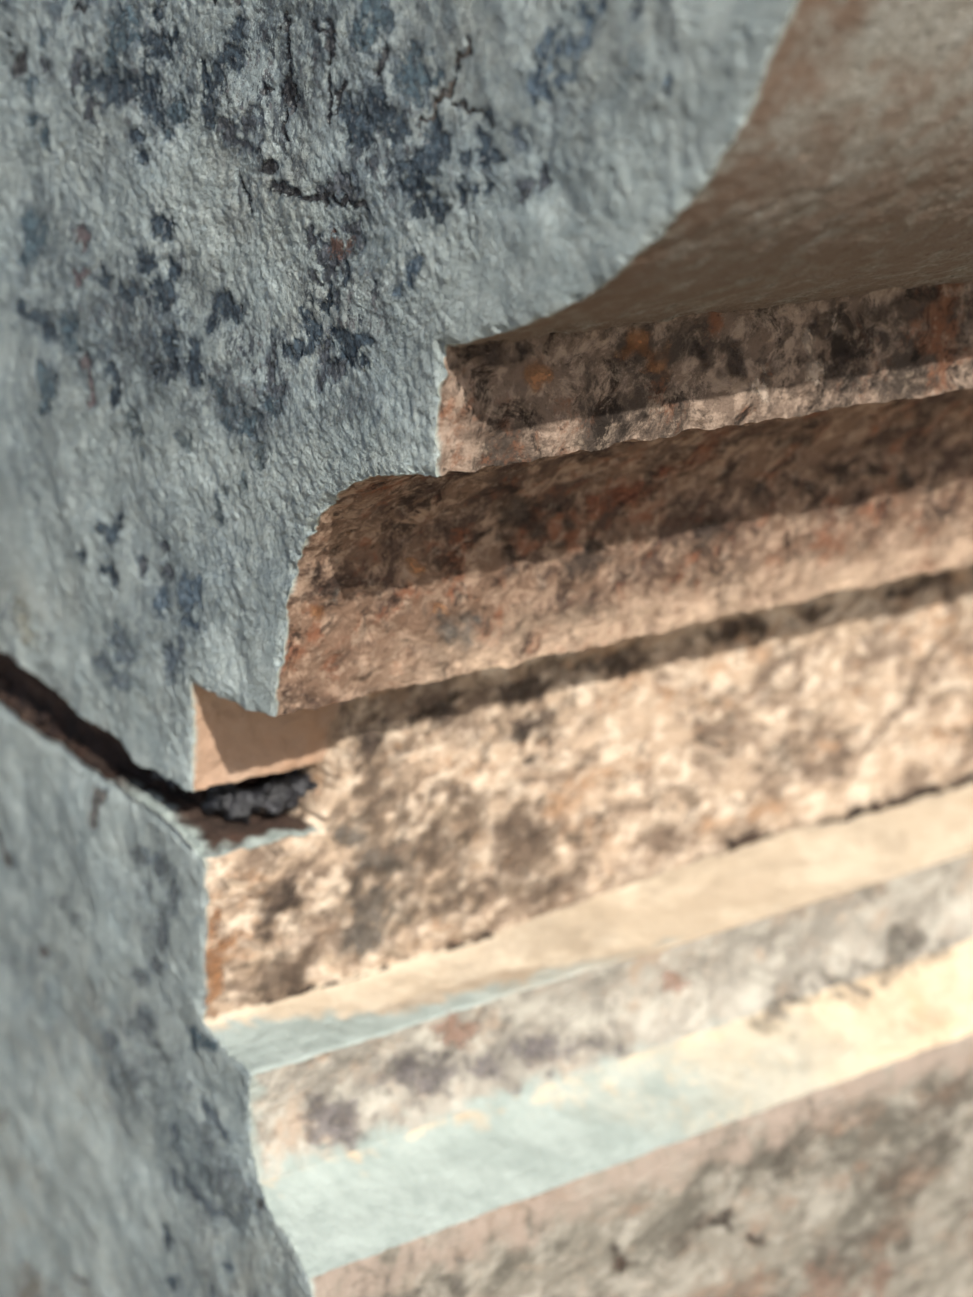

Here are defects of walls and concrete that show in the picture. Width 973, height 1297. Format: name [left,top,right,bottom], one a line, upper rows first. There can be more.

corrosion [328,229,356,261]
corrosion [450,341,533,369]
corrosion [726,340,766,400]
corrosion [806,330,824,381]
water stain [705,611,769,646]
water stain [801,602,841,625]
water stain [575,645,647,680]
water stain [404,693,459,748]
water stain [493,677,560,765]
corrosion [205,909,243,1010]